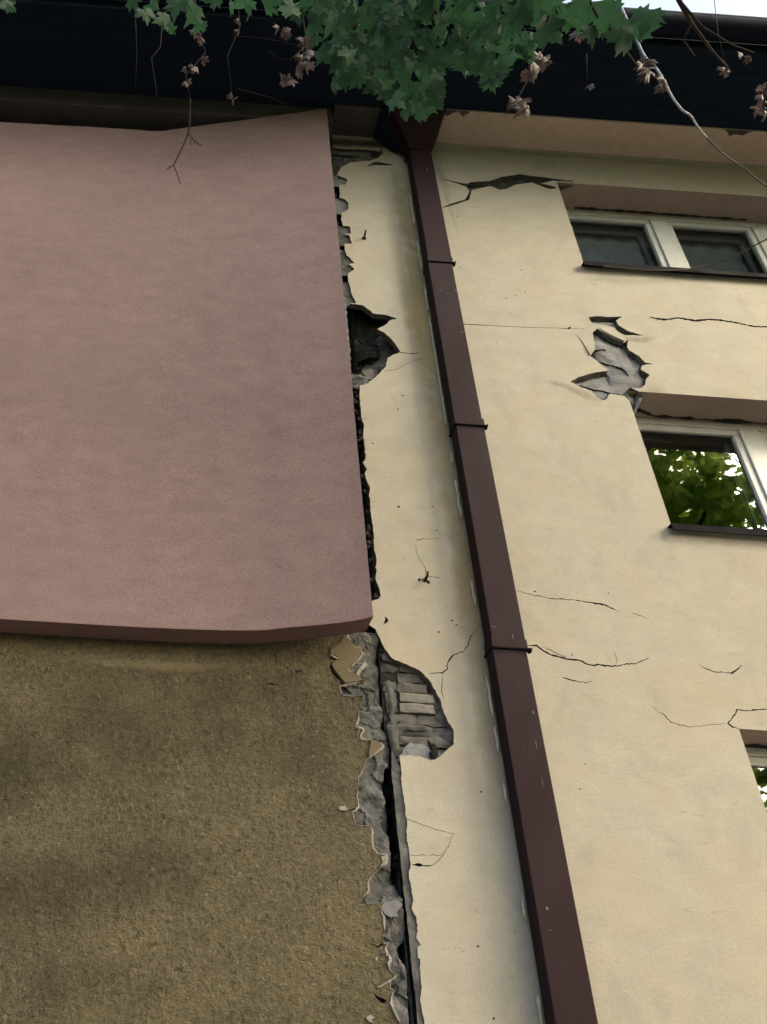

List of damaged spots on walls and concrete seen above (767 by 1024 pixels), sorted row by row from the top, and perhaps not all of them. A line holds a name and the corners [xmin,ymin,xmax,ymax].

crack [442,174,747,221]
flaking render [330,147,400,389]
crack [650,317,767,328]
flaking render [568,316,651,415]
crack [518,591,643,617]
crack [529,644,649,683]
crack [657,709,767,748]
flaking render [330,617,454,1024]